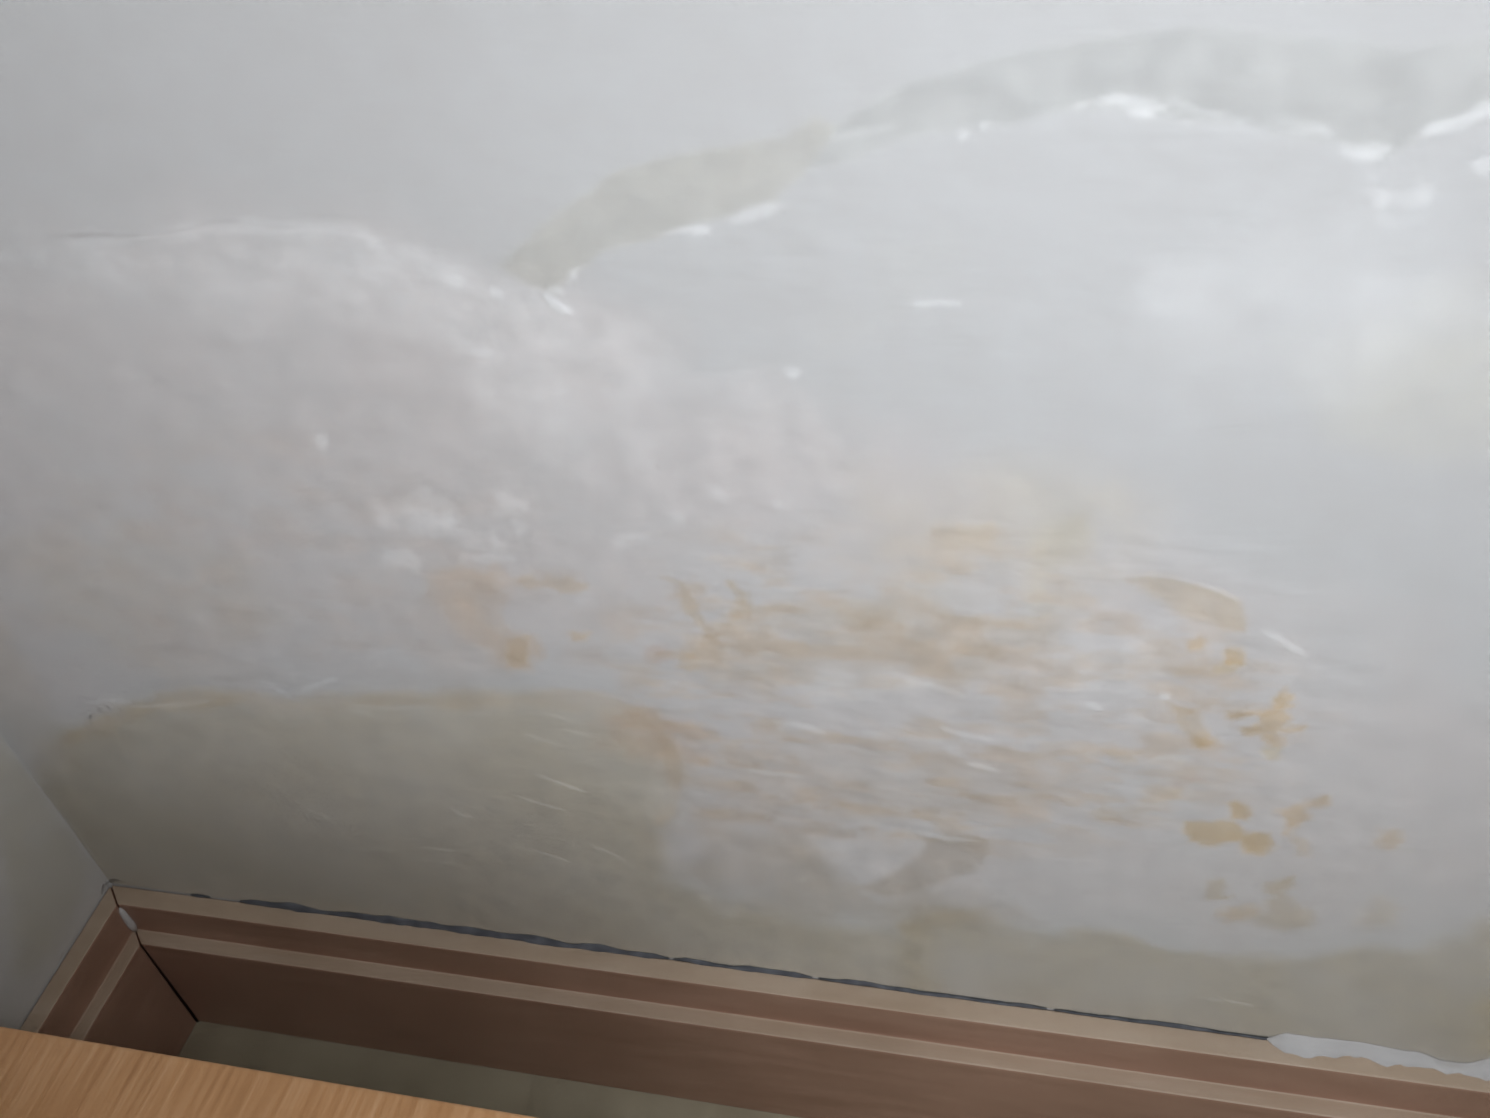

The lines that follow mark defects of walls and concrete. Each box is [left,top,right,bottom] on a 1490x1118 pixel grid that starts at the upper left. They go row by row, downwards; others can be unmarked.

damp [239,899,1268,1040]